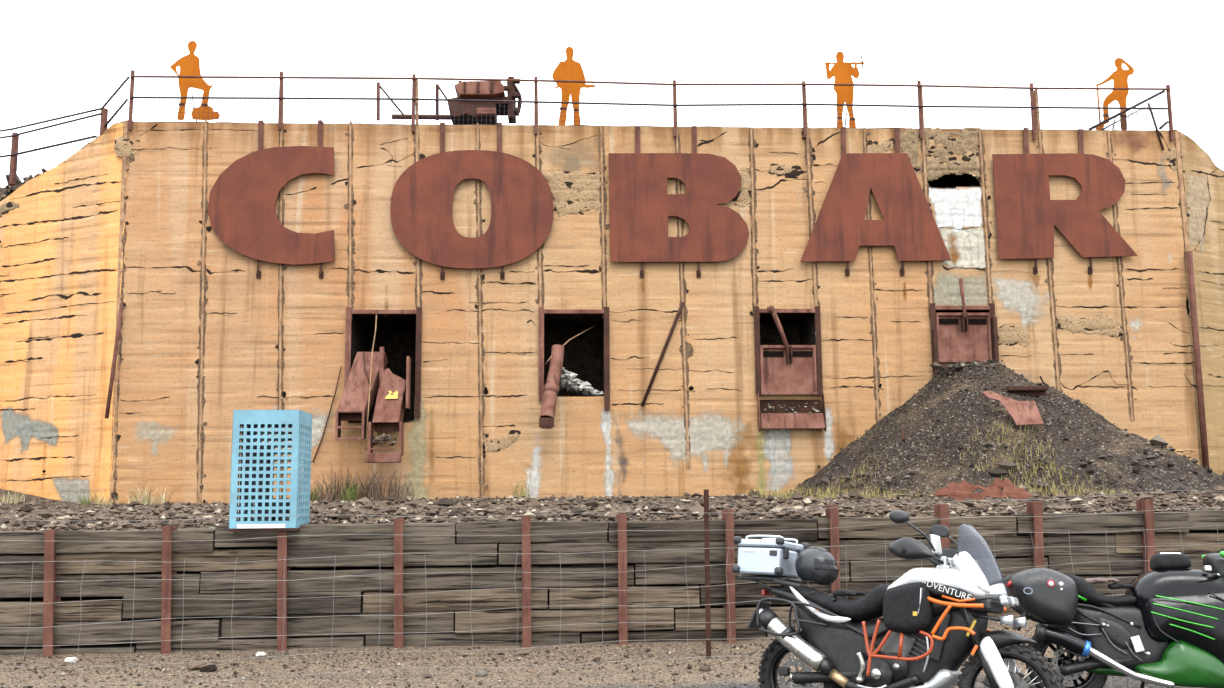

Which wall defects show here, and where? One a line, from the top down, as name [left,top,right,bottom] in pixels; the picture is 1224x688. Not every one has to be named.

crack [0,174,243,363]
crack [131,124,256,150]
spalling [532,128,610,316]
spalling [868,246,883,423]
spalling [863,127,994,306]
spalling [925,261,934,317]
leakage [929,188,1039,327]
crack [1001,132,1224,390]